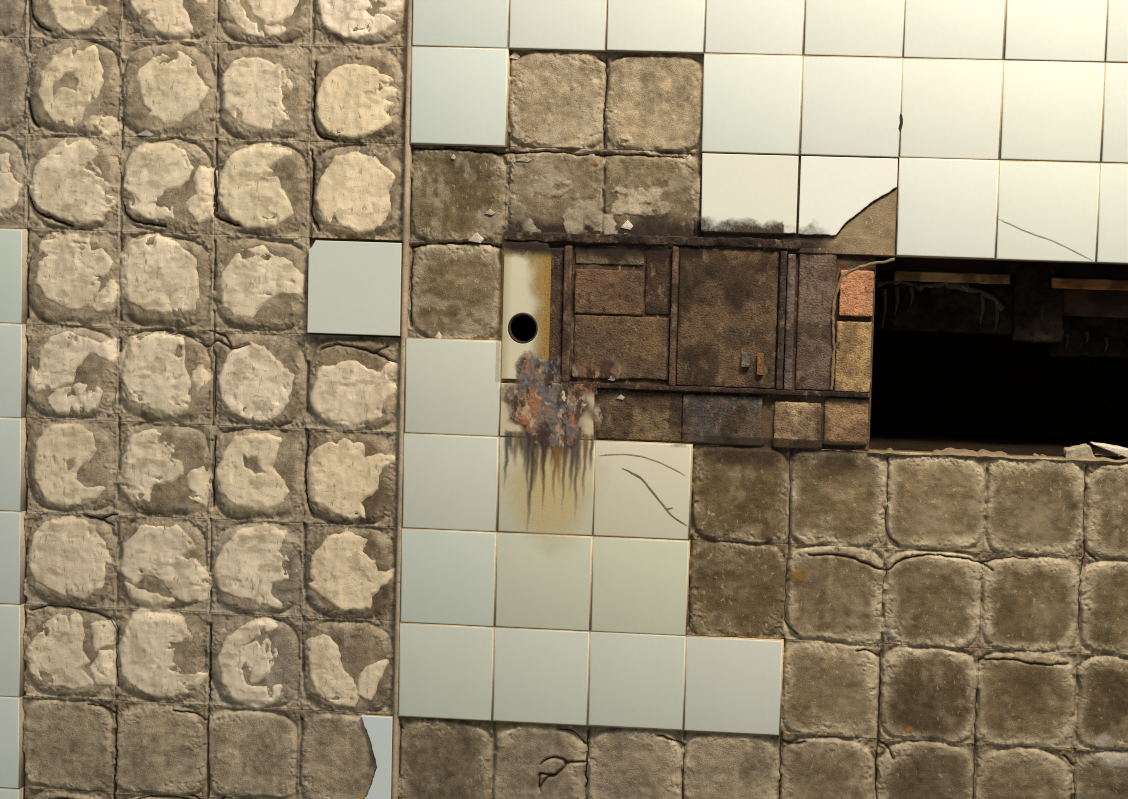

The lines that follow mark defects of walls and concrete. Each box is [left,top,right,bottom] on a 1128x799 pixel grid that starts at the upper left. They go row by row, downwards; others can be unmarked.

spalling [408,49,1128,440]
crack [998,218,1092,260]
spalling [0,0,408,799]
corrosion [504,354,626,503]
crack [605,454,687,526]
spalling [398,444,1128,799]
crack [539,728,589,799]